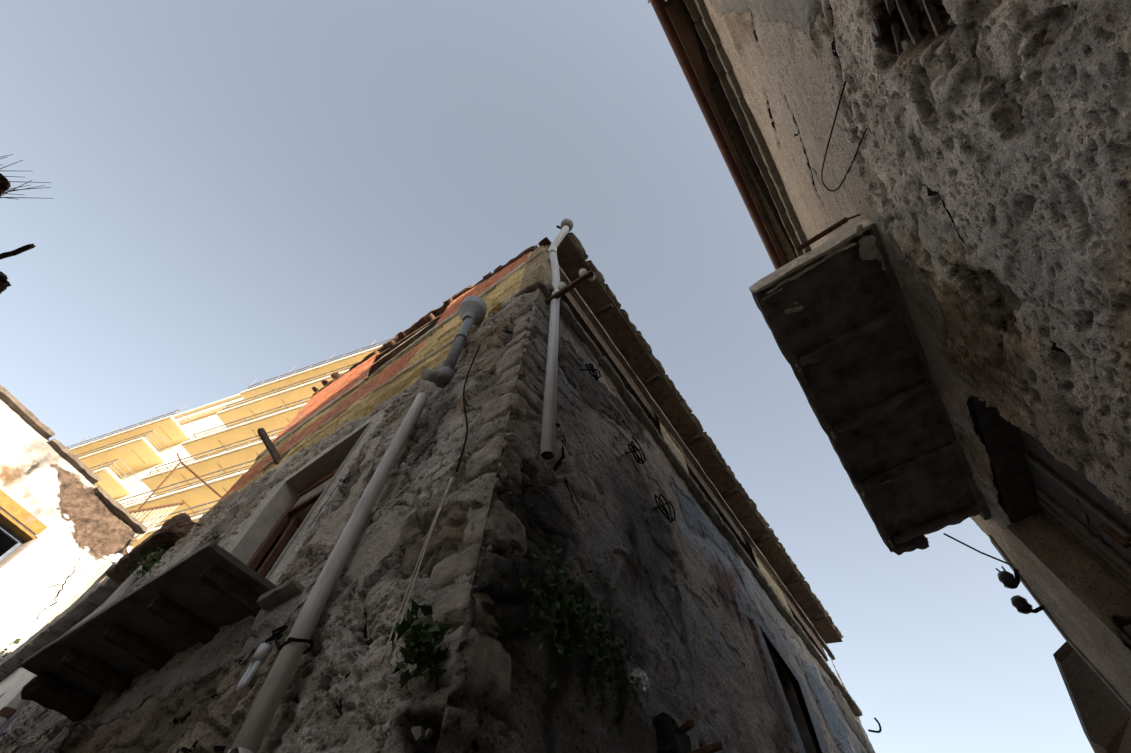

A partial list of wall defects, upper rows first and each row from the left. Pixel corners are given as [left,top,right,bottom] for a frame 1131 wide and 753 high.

spalling [51,464,135,567]
crack [29,547,87,626]